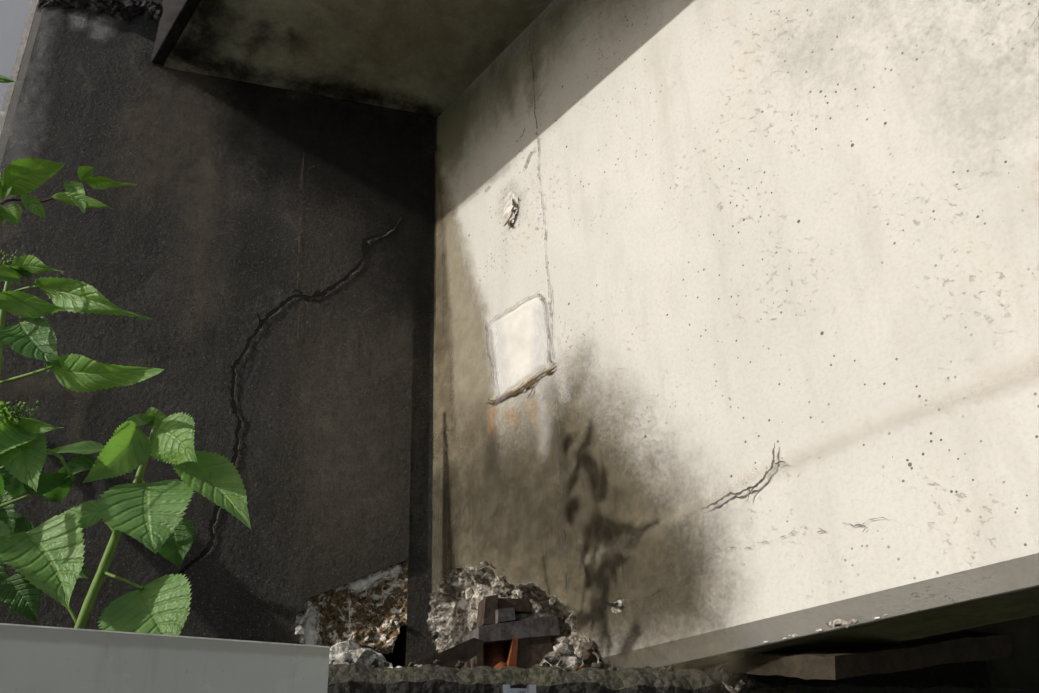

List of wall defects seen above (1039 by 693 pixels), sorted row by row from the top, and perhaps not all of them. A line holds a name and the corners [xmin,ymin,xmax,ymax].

crack [230,205,411,468]
crack [485,34,569,608]
damp [432,147,716,655]
crack [701,443,785,509]
crack [178,505,222,575]
spalling [295,560,408,654]
rust [507,638,518,667]
spalling [427,560,599,672]